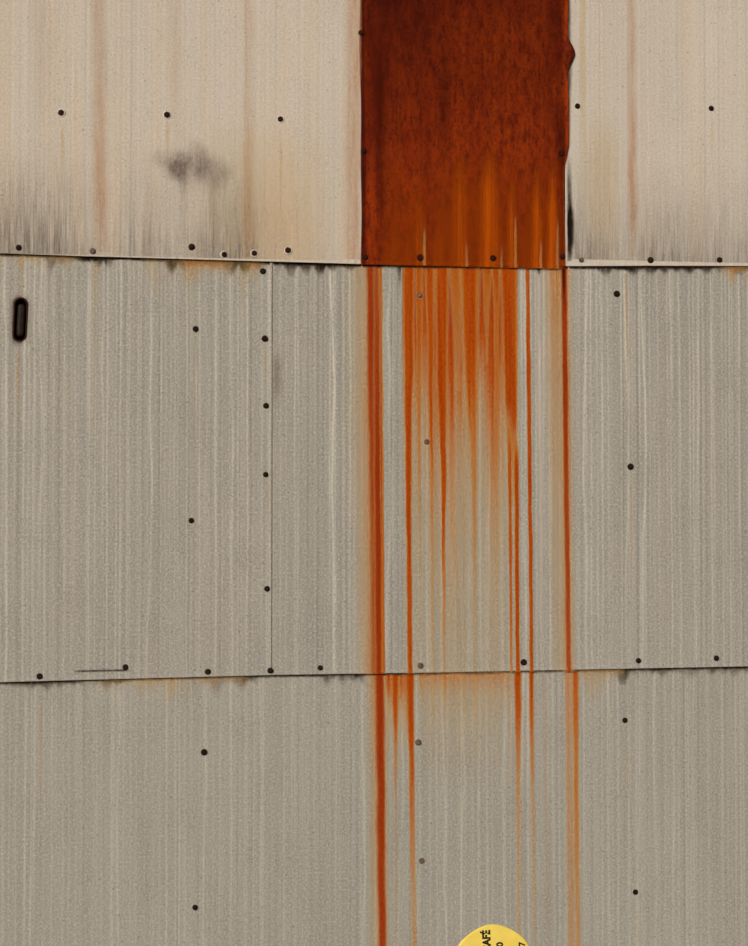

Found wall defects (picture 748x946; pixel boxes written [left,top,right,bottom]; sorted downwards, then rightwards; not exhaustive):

corrosion [366,159,579,946]